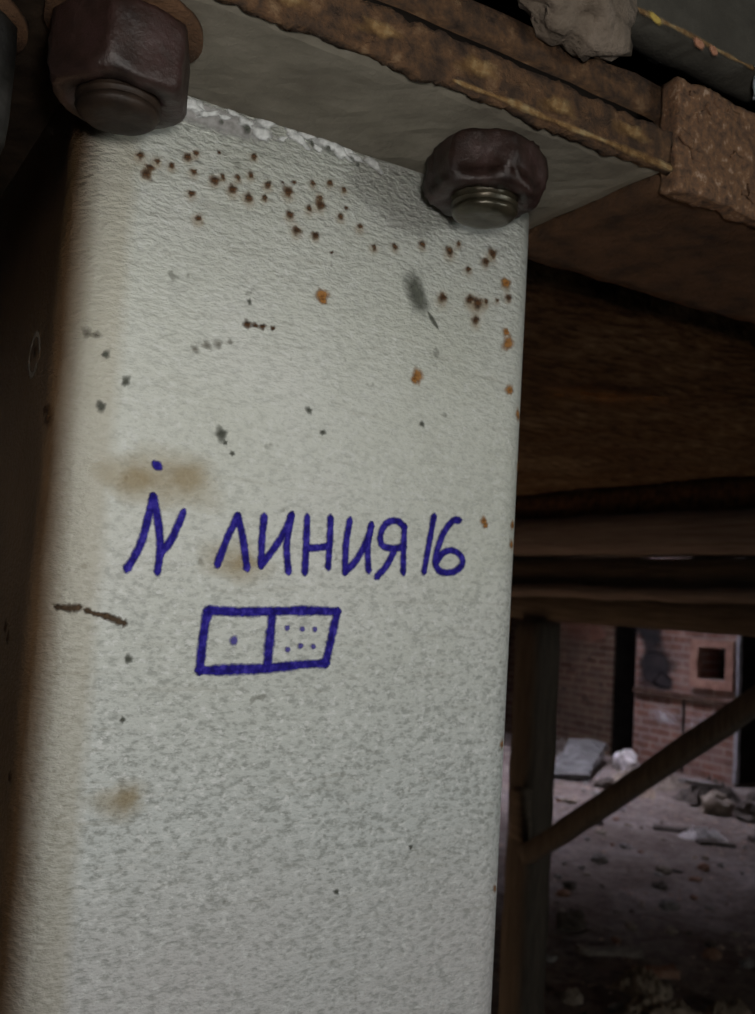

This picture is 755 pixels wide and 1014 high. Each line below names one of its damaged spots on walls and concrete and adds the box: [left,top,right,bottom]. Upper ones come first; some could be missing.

corrosion [368,20,396,37]
corrosion [638,8,755,70]
corrosion [466,57,492,75]
corrosion [137,152,174,178]
corrosion [453,76,755,228]
corrosion [211,172,296,201]
corrosion [317,289,328,304]
corrosion [467,279,512,323]
corrosion [503,328,524,350]